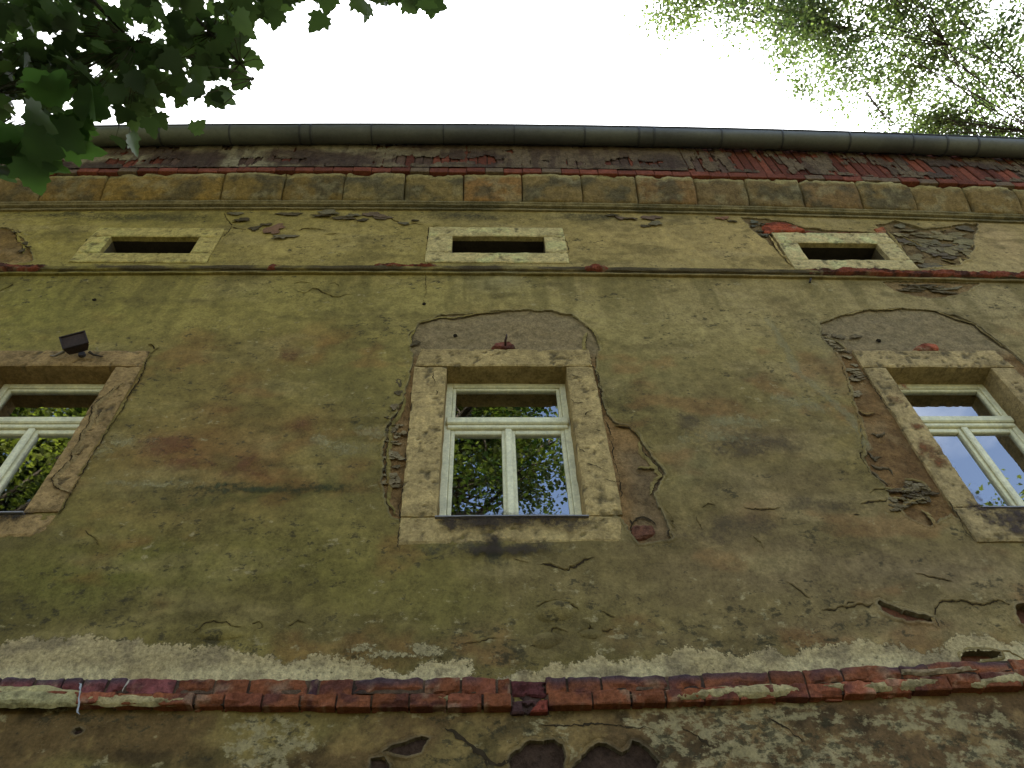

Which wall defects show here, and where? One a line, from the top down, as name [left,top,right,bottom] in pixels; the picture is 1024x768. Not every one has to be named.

peeling [227,209,419,239]
spalling [0,226,48,272]
spalling [714,216,1024,529]
spalling [377,308,677,547]
crack [514,556,596,571]
crack [916,572,1011,628]
spalling [957,647,1005,662]
spalling [364,732,434,768]
spalling [504,735,664,768]